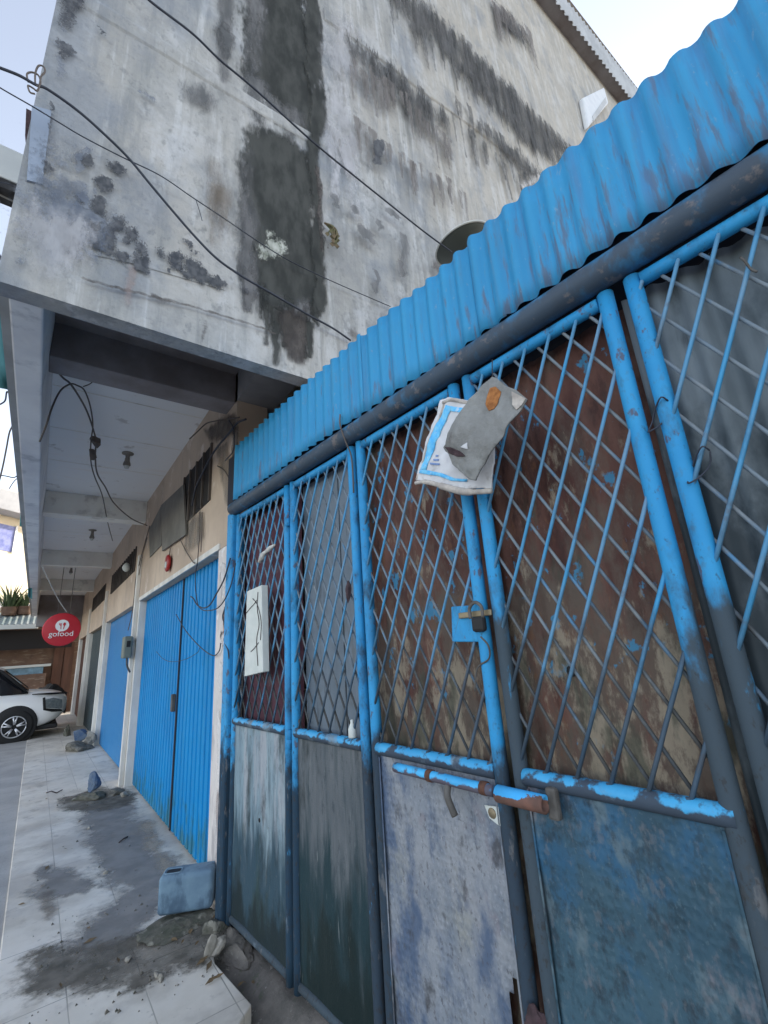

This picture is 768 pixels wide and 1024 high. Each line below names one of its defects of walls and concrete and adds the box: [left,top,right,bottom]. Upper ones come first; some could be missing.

water stain [16,101,127,262]
water stain [132,251,151,275]
water stain [217,0,324,365]
water stain [329,0,571,276]
rust [485,387,501,411]